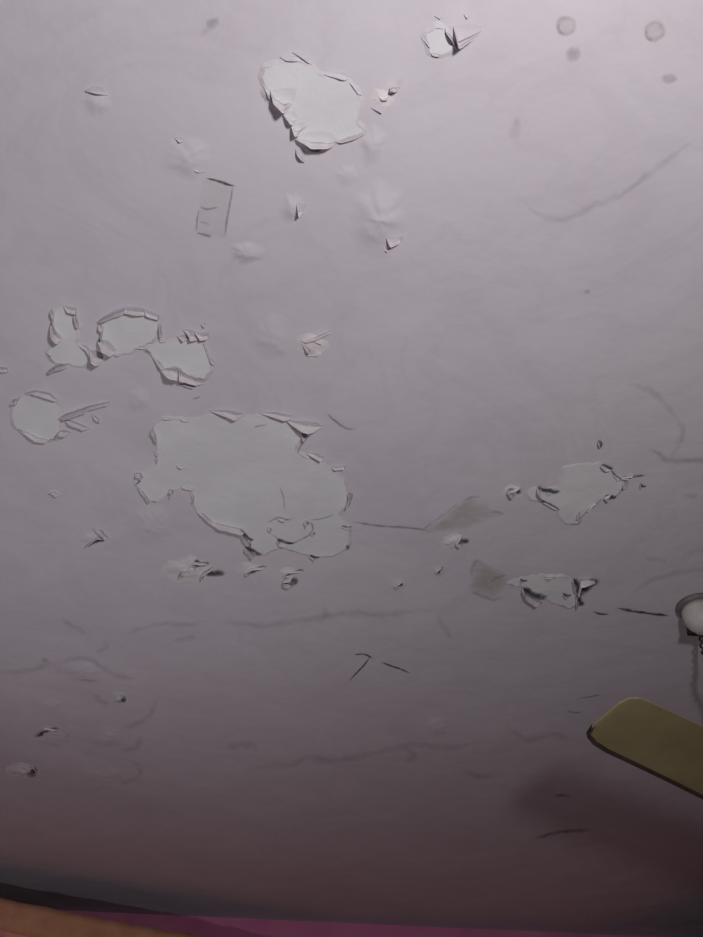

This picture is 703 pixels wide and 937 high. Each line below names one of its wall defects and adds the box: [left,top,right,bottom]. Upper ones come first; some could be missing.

peeling [421,16,482,58]
peeling [258,52,400,163]
peeling [45,306,215,389]
peeling [10,392,109,443]
peeling [133,410,352,577]
peeling [502,461,646,525]
peeling [161,554,222,582]
peeling [505,573,596,609]